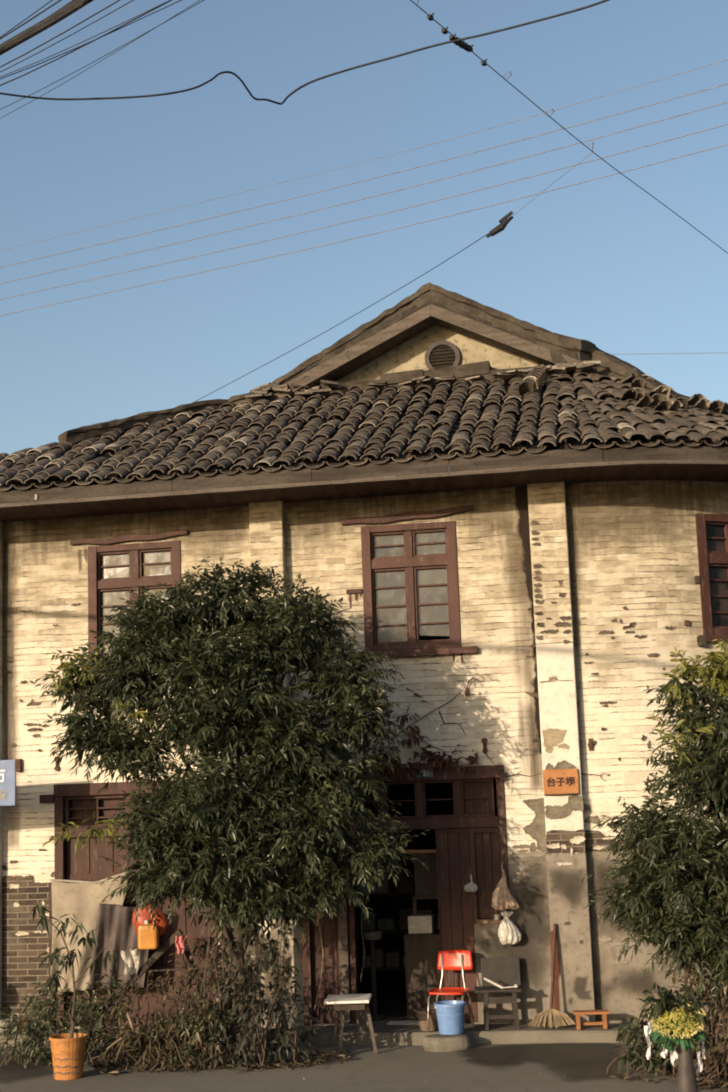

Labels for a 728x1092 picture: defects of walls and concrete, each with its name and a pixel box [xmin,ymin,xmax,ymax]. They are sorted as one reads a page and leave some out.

spalling [598,606,647,639]
spalling [23,723,49,752]
peeling [542,728,577,770]
spalling [511,795,636,866]
damp [553,872,582,902]
damp [485,868,544,983]
damp [569,978,590,1003]